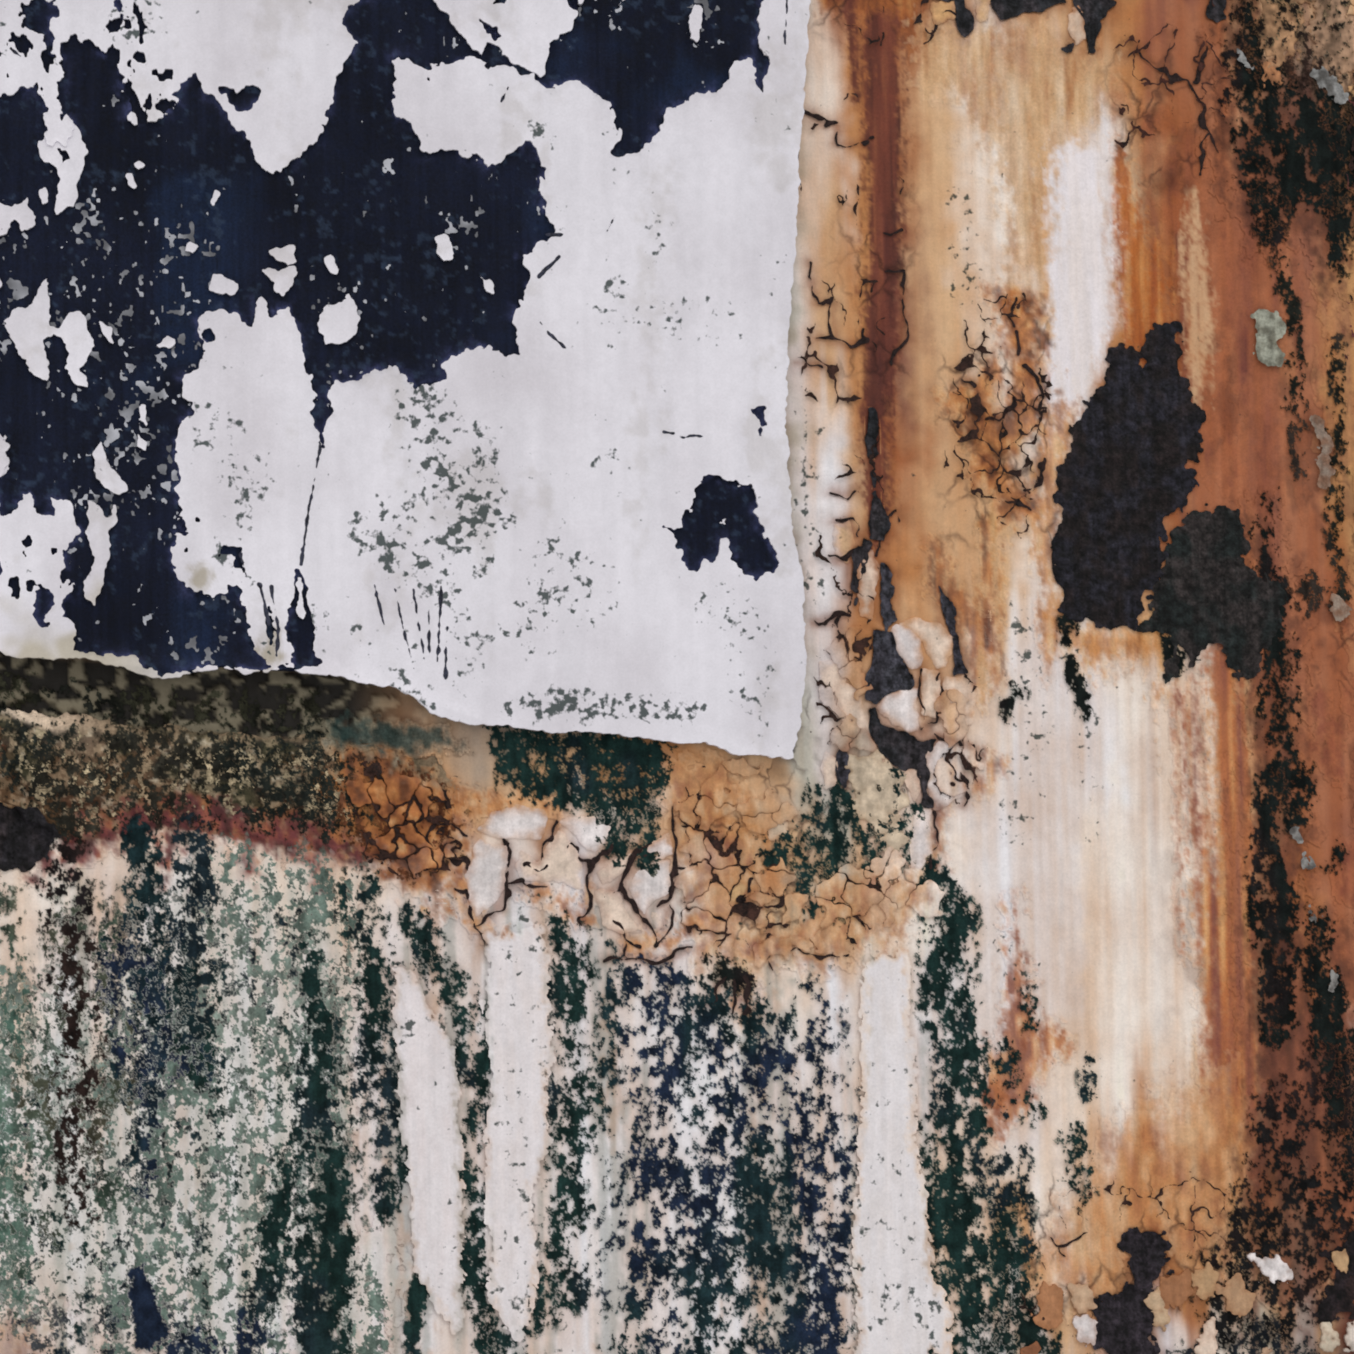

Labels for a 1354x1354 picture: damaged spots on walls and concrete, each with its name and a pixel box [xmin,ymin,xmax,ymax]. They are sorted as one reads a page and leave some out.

crack [1114,1,1232,176]
peeling [0,0,779,677]
crack [944,293,1053,539]
leakage [1055,614,1092,723]
rust [812,0,1354,1343]
leakage [1166,0,1354,1354]
rust [19,744,566,945]
leakage [0,667,1102,1354]
crack [345,668,985,1015]
rust [617,739,1015,1037]
peeling [1019,1227,1293,1354]
peeling [1312,1231,1354,1353]